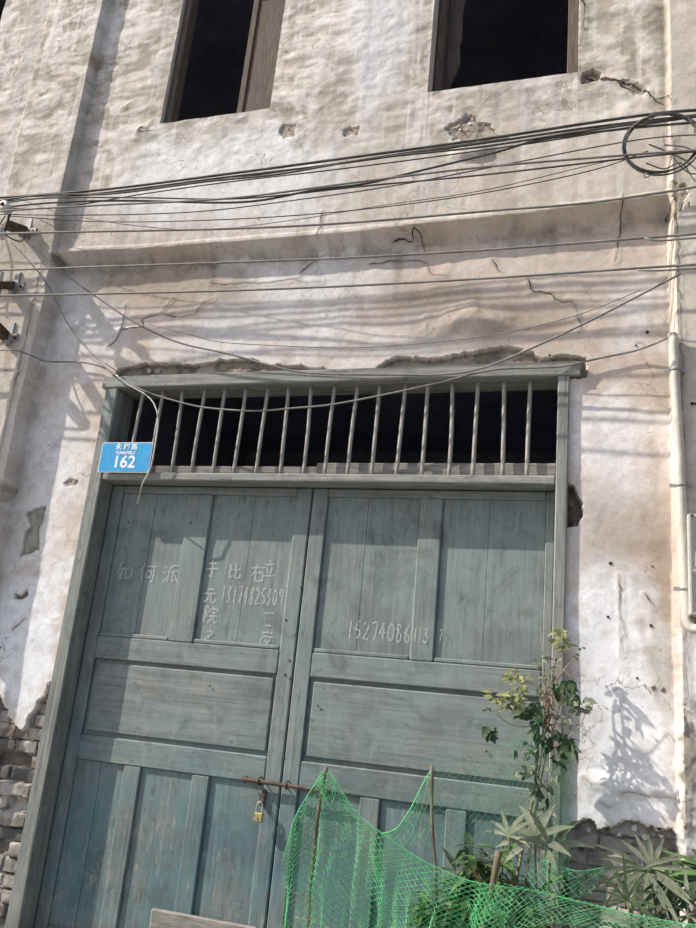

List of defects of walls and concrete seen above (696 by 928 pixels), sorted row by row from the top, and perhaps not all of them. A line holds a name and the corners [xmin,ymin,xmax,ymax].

flaking render [443,111,499,143]
crack [107,214,324,348]
crack [371,227,445,276]
crack [528,279,582,333]
crack [586,77,685,438]
flaking render [113,356,329,376]
flaking render [568,479,585,528]
flaking render [19,504,47,558]
crack [586,634,690,830]
flaking render [0,680,51,928]
flaking render [559,702,696,928]